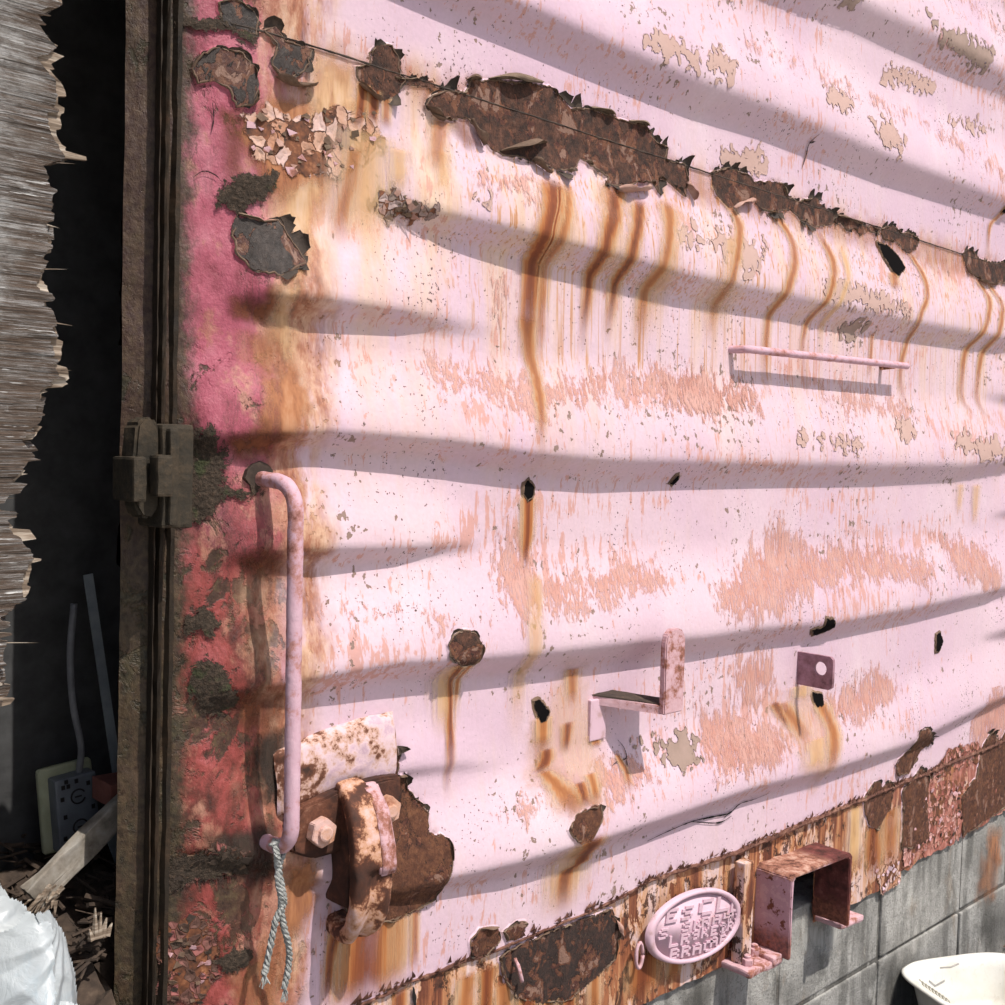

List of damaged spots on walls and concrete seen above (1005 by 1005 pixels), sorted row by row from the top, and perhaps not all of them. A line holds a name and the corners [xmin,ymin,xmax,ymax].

peeling [189,0,699,211]
peeling [228,211,311,280]
peeling [367,181,441,227]
rust [520,182,578,423]
rust [583,189,645,311]
rust [764,217,800,344]
peeling [709,139,920,277]
rust [960,282,1005,385]
peeling [567,510,1002,845]
rust [535,716,599,804]
rust [325,912,420,992]
peeling [467,906,625,1005]